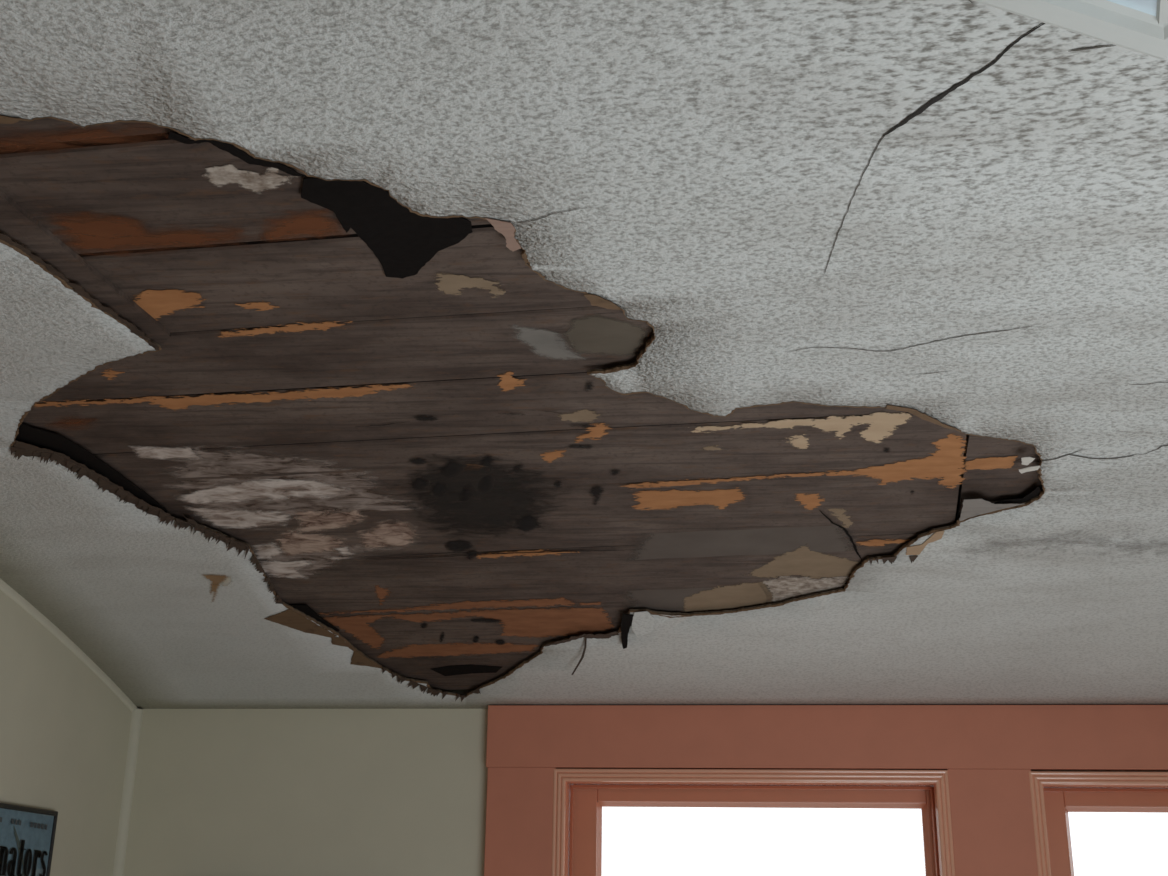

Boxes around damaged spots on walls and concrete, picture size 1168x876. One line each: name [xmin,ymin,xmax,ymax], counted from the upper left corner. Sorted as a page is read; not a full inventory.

crack [824,23,1046,274]
damp [134,447,561,578]
peeling [0,115,1045,702]
crack [1042,445,1168,462]